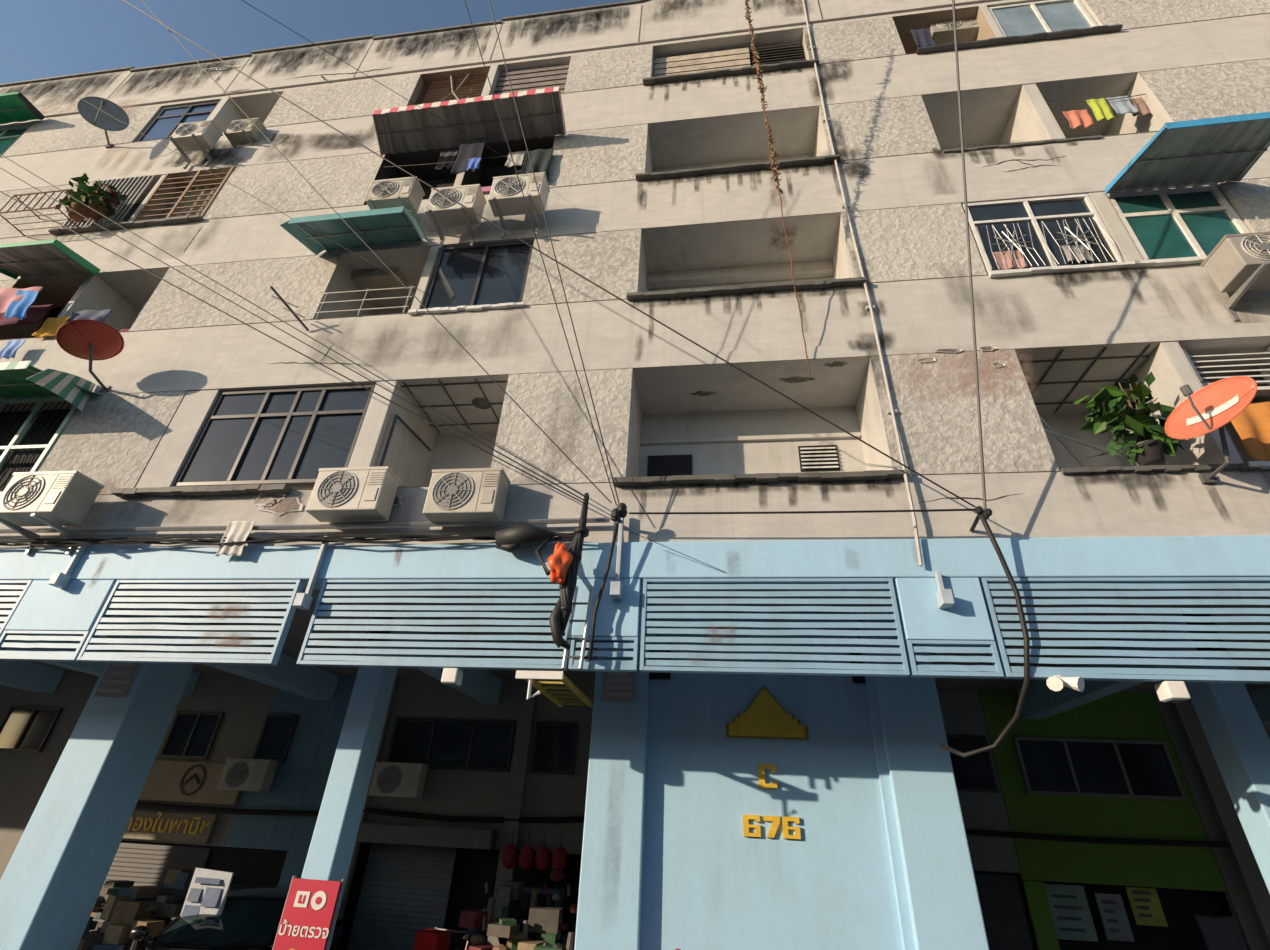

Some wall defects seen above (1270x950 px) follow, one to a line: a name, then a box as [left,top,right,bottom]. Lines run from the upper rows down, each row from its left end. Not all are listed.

water stain [510,9,629,42]
water stain [251,29,488,73]
water stain [7,63,231,100]
water stain [270,134,299,155]
water stain [314,135,360,146]
crack [984,156,1065,172]